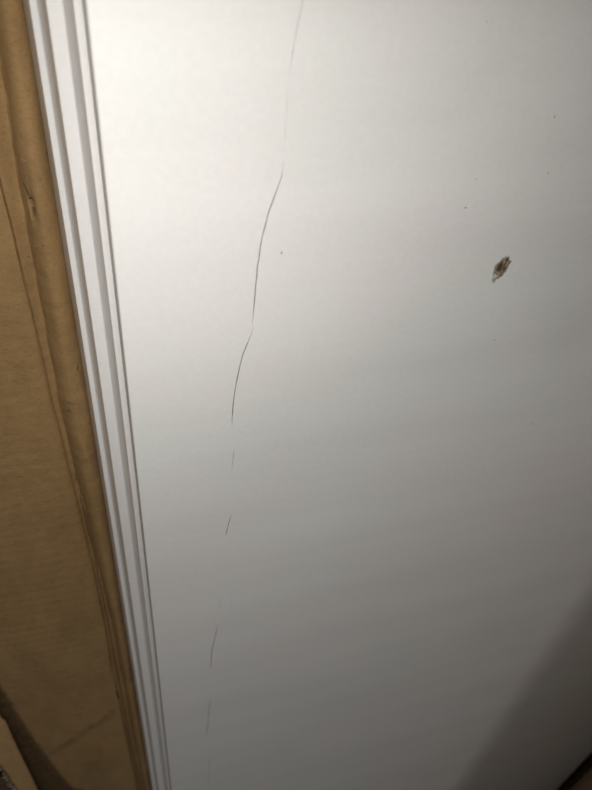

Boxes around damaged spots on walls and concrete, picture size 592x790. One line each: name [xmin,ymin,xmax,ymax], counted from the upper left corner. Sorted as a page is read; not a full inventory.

crack [232,170,283,416]